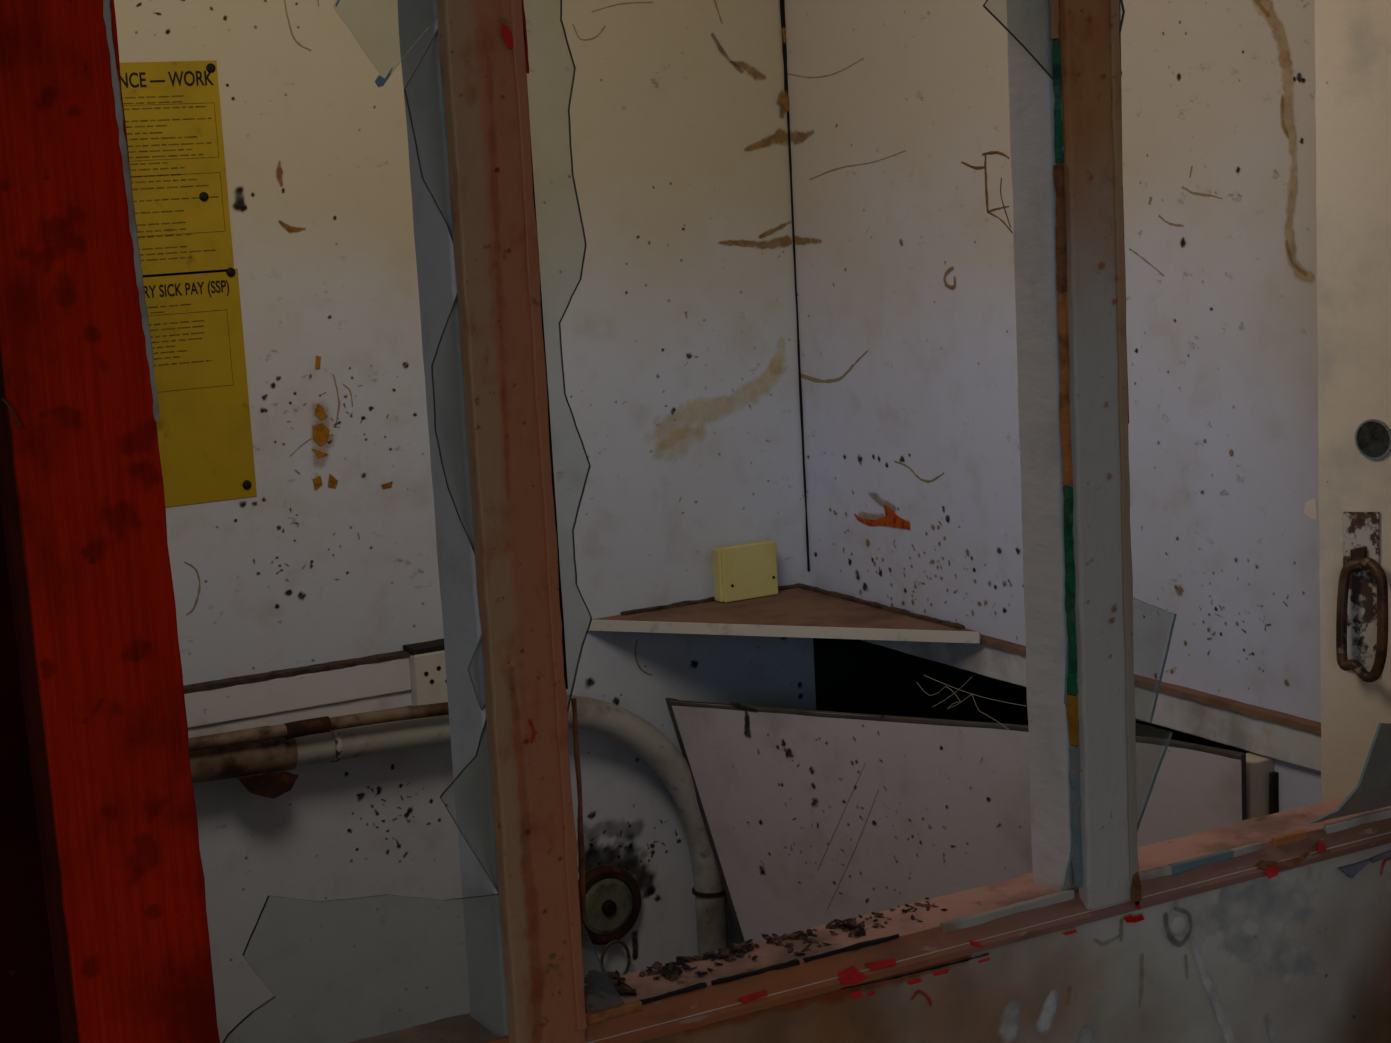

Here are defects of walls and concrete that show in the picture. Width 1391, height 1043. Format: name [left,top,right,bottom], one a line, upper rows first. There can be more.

crack [573,2,653,41]
crack [1129,166,1240,276]
crack [777,0,906,571]
corrosion [833,505,927,535]